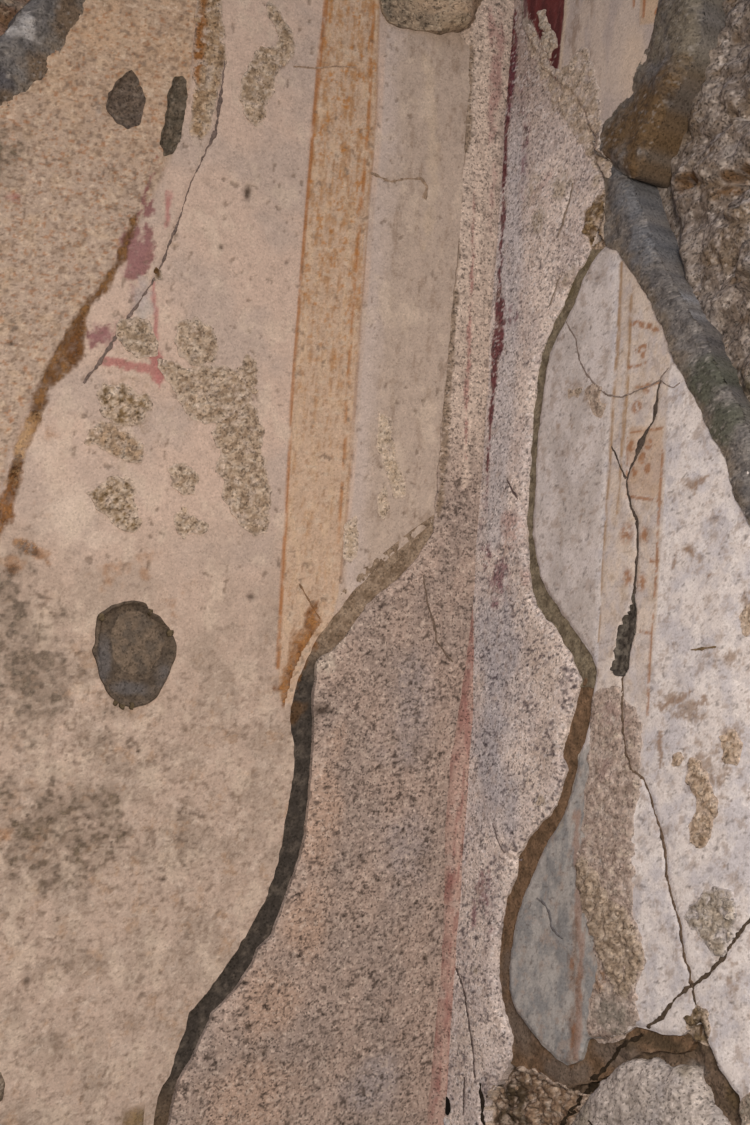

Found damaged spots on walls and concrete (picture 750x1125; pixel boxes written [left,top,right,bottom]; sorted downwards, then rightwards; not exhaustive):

peeling [106,70,146,129]
spalling [522,9,612,250]
crack [557,183,574,238]
spalling [84,382,153,533]
spalling [115,316,272,540]
crack [547,277,680,594]
crack [691,644,716,652]
crack [536,898,562,939]
spalling [575,686,647,1044]
crack [560,676,750,1125]
spalling [671,752,719,848]
spalling [484,1066,590,1125]